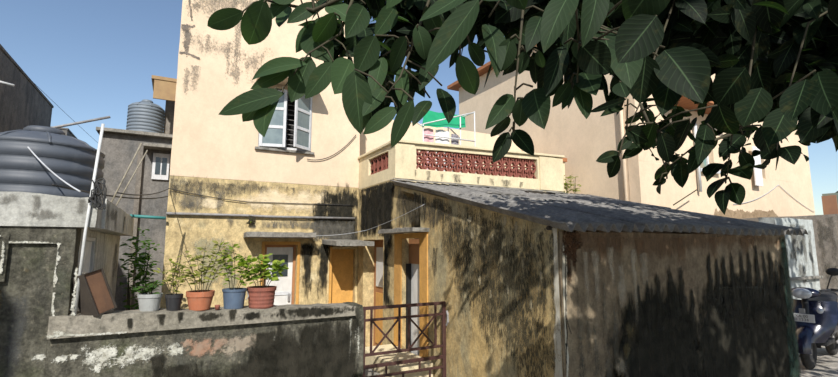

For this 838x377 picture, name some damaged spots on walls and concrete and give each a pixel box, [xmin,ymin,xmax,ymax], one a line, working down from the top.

damp [186,0,253,18]
damp [193,21,263,82]
damp [169,178,268,214]
damp [266,181,562,377]
peeling [32,334,256,373]
damp [151,306,362,377]